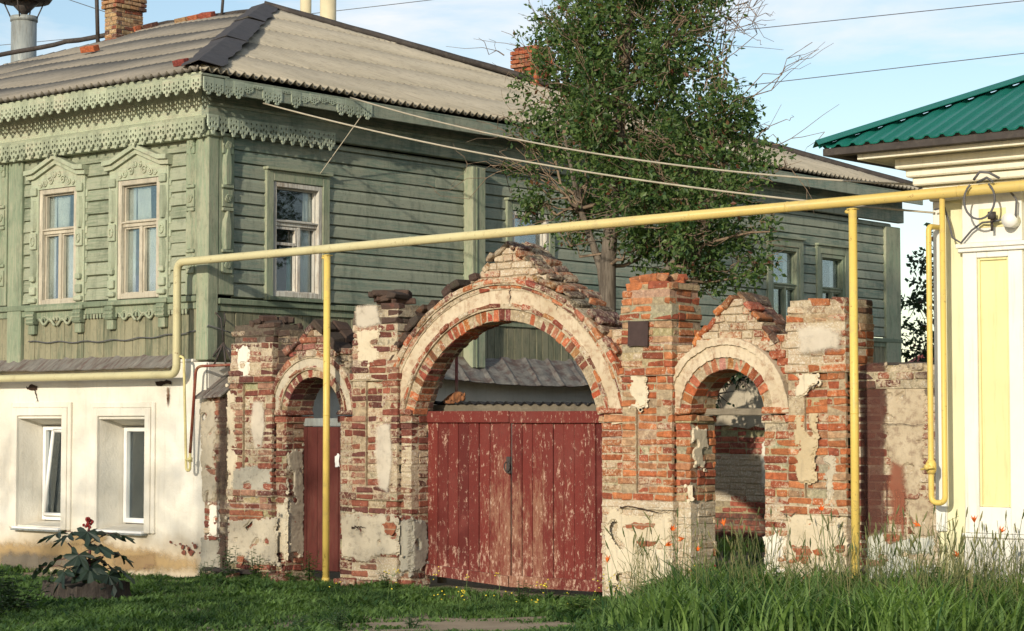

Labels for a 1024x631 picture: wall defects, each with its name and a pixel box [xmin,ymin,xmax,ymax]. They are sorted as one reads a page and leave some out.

leakage [862,389,888,539]
spalling [224,510,264,520]
spalling [382,515,403,536]
peeling [169,541,201,556]